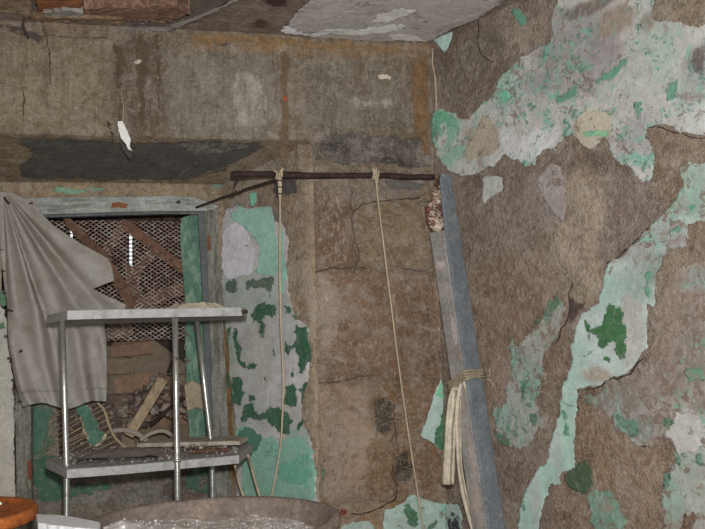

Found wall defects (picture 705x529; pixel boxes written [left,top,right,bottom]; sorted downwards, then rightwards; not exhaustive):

peeling [312,0,705,203]
crack [315,192,421,273]
peeling [221,192,326,502]
crack [319,375,370,384]
crack [555,282,573,345]
peeling [491,162,705,529]
crack [563,358,644,409]
crack [351,404,399,515]